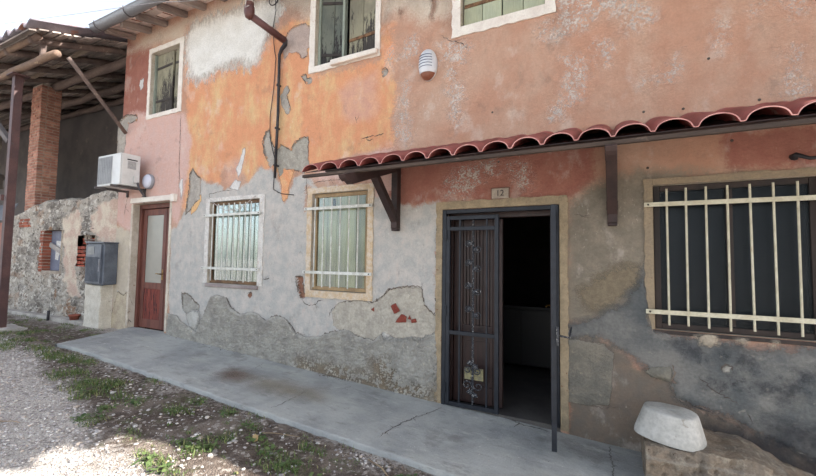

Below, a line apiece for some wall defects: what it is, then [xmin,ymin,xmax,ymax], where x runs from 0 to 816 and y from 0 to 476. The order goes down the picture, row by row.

flaking render [283,23,310,59]
flaking render [280,85,291,115]
flaking render [262,129,309,202]
flaking render [185,168,201,215]
flaking render [295,275,305,299]
flaking render [166,285,437,402]